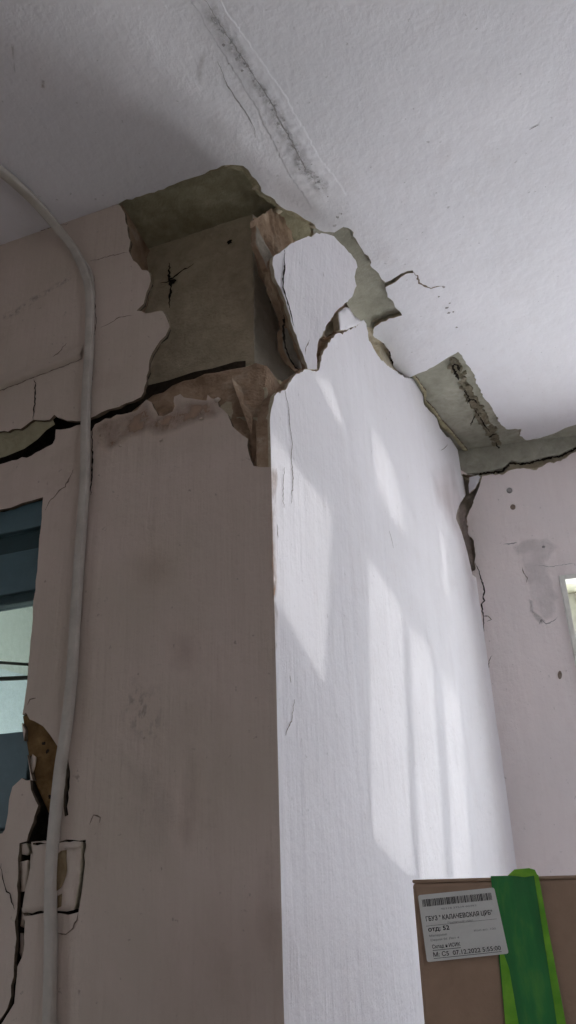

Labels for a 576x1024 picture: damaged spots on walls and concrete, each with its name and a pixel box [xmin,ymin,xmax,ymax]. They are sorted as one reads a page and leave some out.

flaking render [121,205,150,271]
peeling [250,205,403,375]
flaking render [0,420,55,458]
crack [0,376,141,510]
spalling [104,361,280,466]
flaking render [463,447,576,482]
crack [456,475,492,629]
peeling [57,850,67,908]